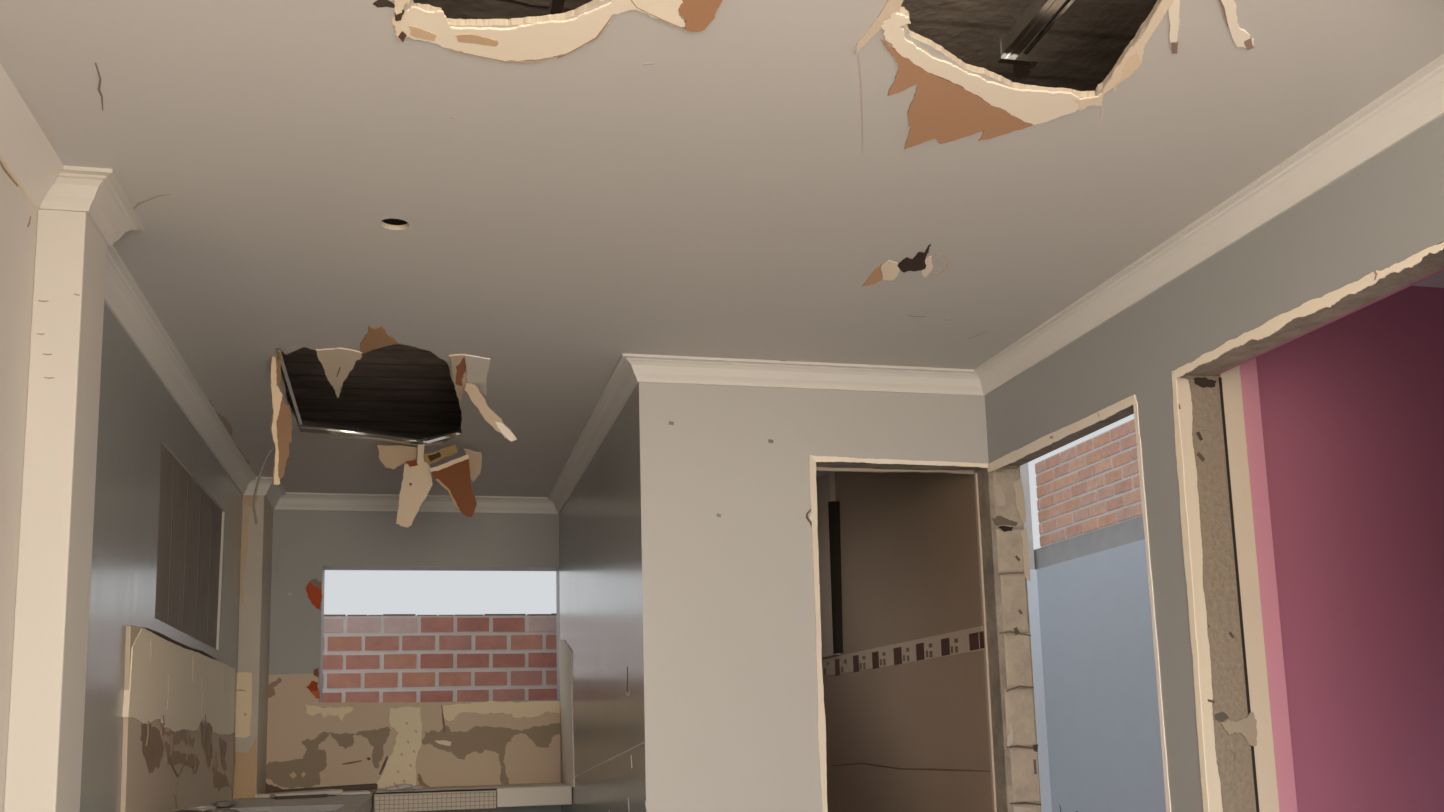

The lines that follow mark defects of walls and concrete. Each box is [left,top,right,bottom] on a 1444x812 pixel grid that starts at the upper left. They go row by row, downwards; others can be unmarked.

spalling [392,0,686,61]
peeling [1221,0,1254,51]
spalling [855,0,1180,125]
spalling [881,244,933,280]
spalling [316,348,362,398]
peeling [449,354,490,409]
spalling [306,667,320,699]
spalling [266,722,560,789]